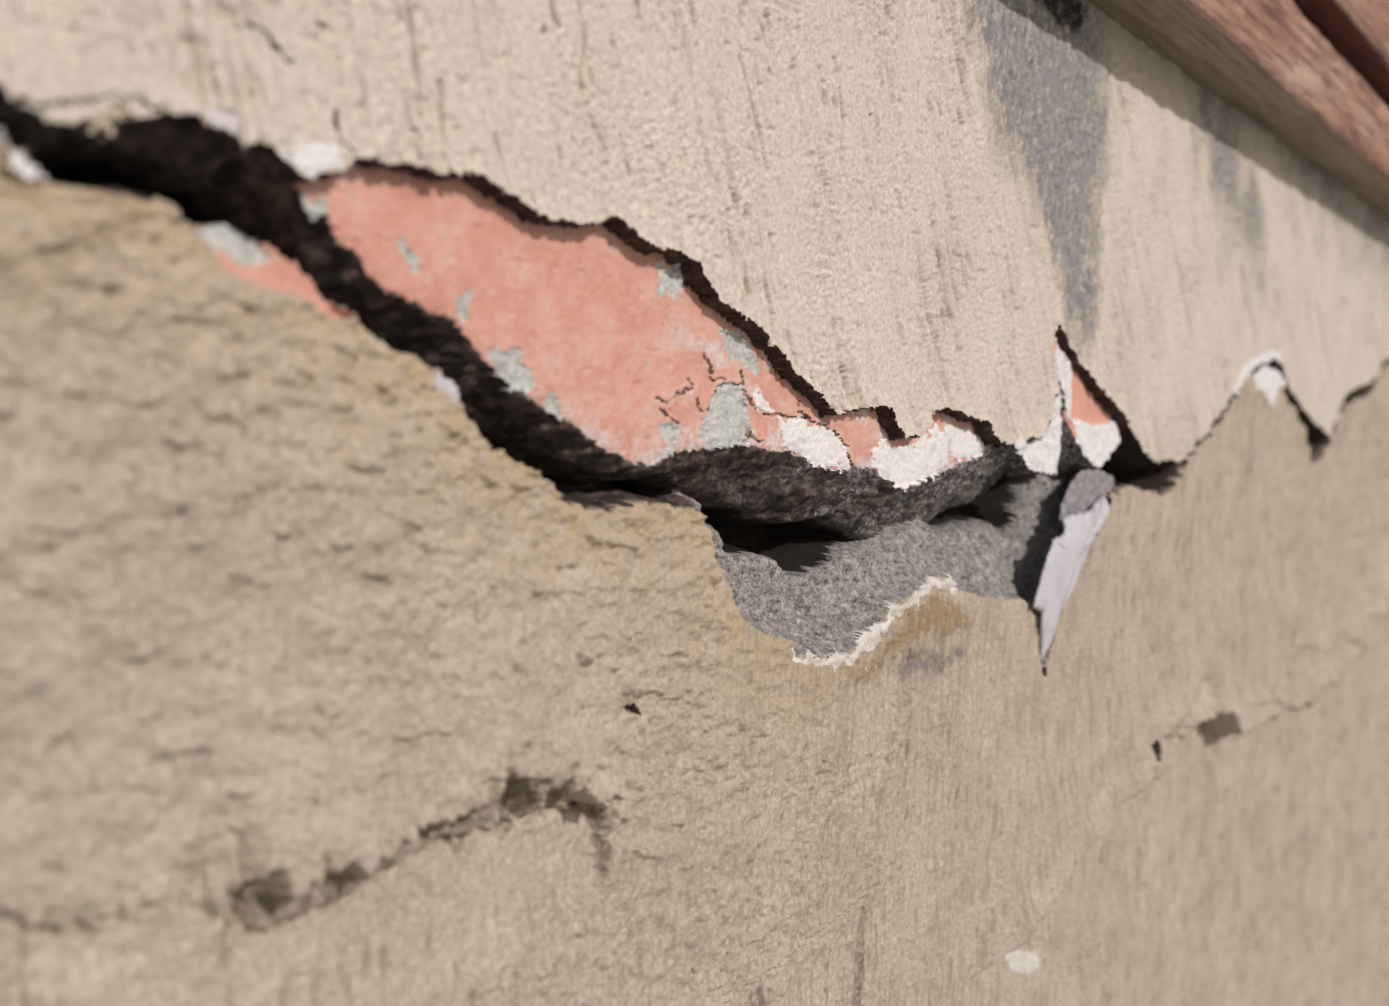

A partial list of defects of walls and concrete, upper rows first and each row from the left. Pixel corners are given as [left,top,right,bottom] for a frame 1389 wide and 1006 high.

peeling [189,224,355,319]
crack [0,81,1389,573]
peeling [277,137,1133,677]
water stain [972,0,1107,347]
spalling [1231,350,1287,409]
spalling [1005,948,1040,974]